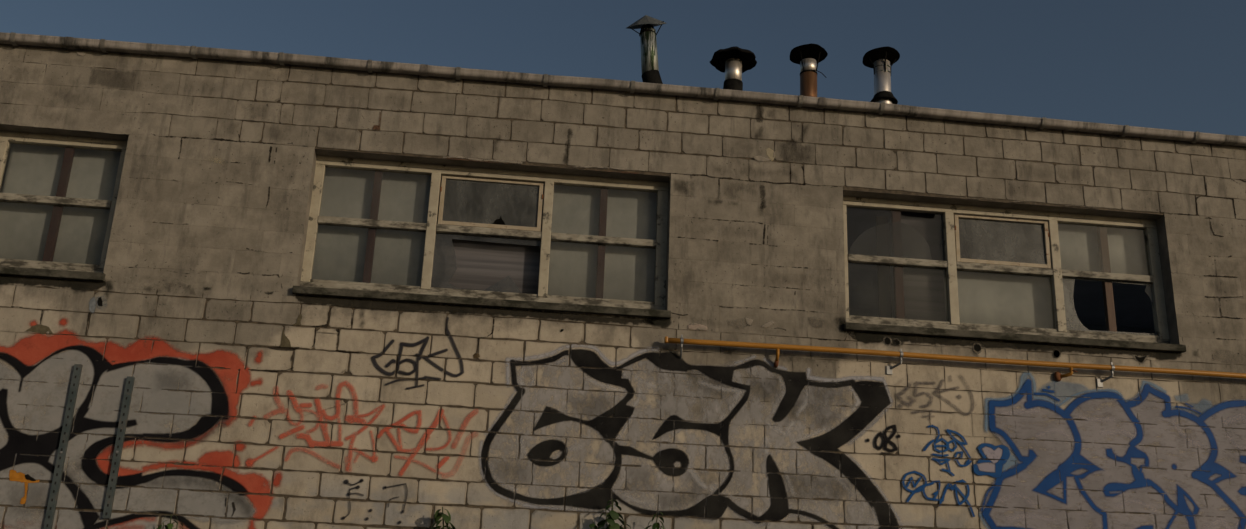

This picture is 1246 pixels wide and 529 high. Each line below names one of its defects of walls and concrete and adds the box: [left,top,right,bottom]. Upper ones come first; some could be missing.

crack [1162,177,1246,356]